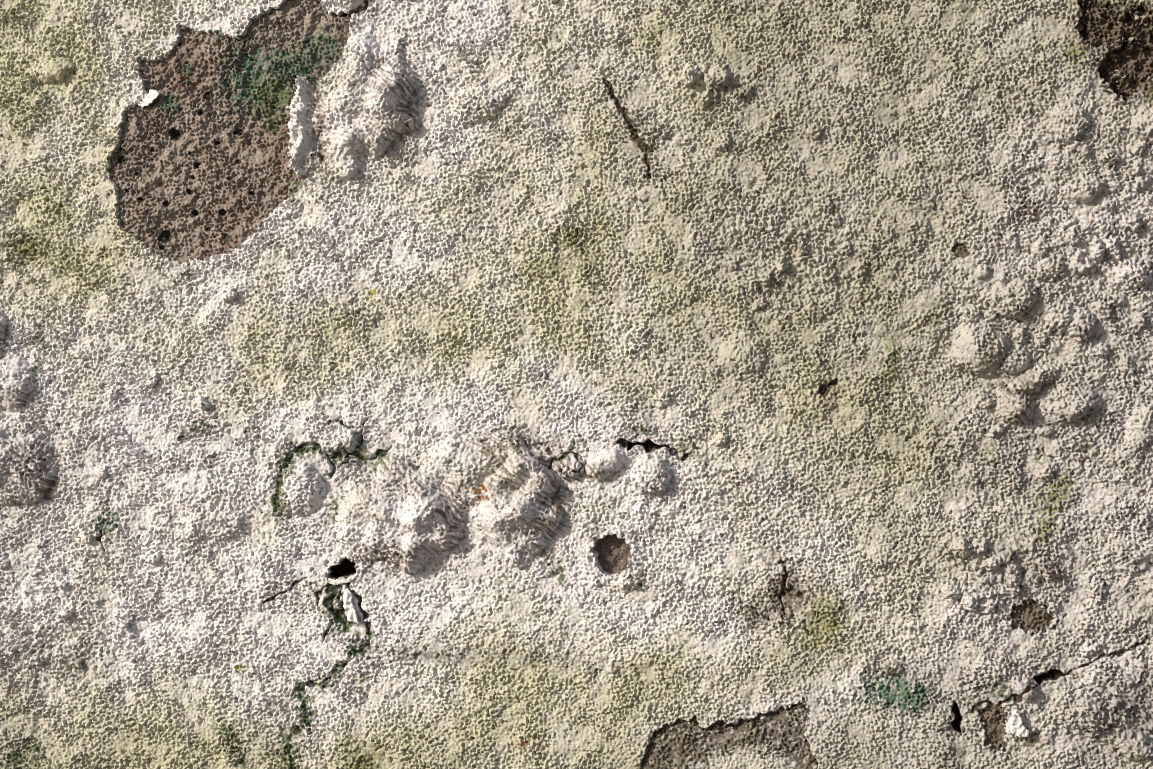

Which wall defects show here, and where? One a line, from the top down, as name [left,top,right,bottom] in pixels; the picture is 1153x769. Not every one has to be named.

spalling [1069,0,1153,106]
spalling [109,0,352,264]
crack [604,80,652,179]
crack [265,416,392,522]
crack [617,438,691,461]
spalling [593,534,631,574]
crack [263,559,377,769]
spalling [1008,599,1059,633]
crack [951,636,1151,734]
leakage [0,746,44,769]
peeling [645,704,816,769]